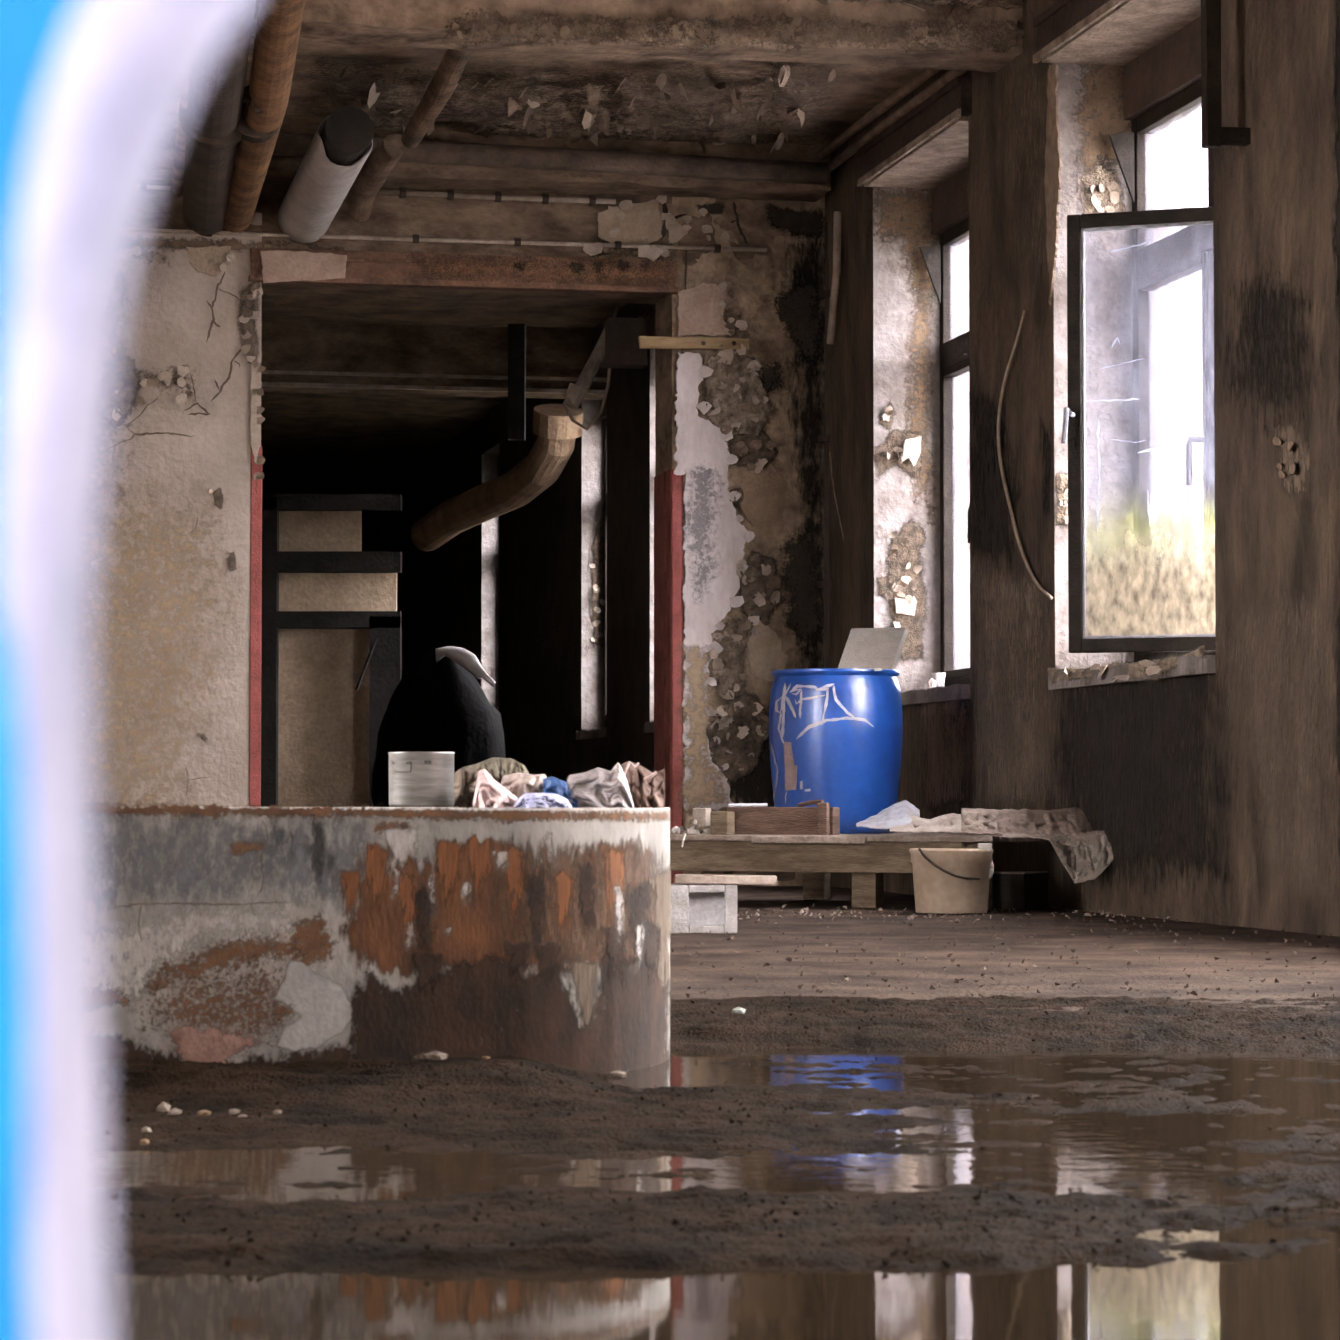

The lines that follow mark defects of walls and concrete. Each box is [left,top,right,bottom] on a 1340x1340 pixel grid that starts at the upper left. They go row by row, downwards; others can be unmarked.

flaking render [583,195,736,262]
peeling [1044,65,1062,306]
peeling [1080,159,1126,214]
crack [107,272,241,461]
peeling [874,403,922,479]
peeling [673,274,788,826]
peeling [877,519,928,662]
rust [96,802,669,1064]
spalling [169,1025,260,1063]
flaking render [272,961,353,1051]